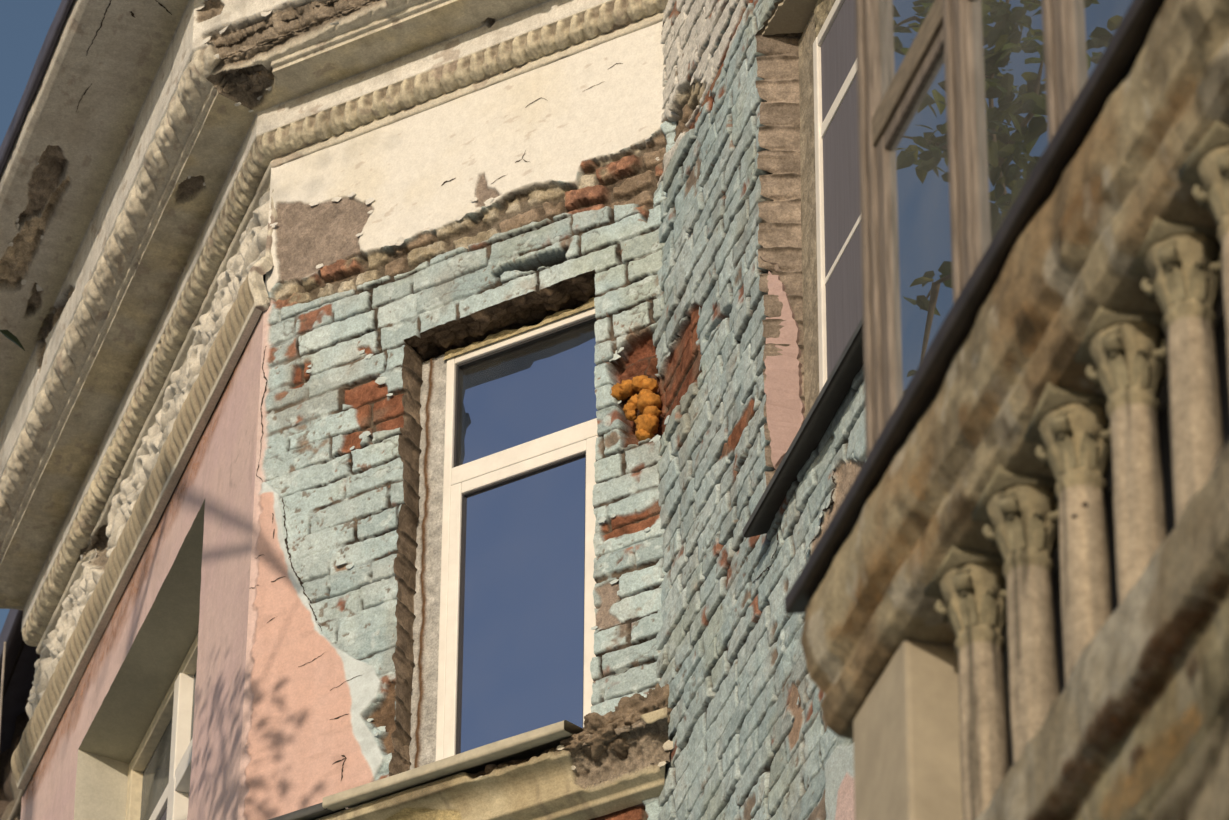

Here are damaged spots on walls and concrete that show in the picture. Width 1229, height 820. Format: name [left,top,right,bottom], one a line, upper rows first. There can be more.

crack [86,0,111,55]
spalling [195,0,386,112]
spalling [270,0,753,309]
flaking render [0,145,75,374]
flaking render [291,362,312,389]
flaking render [340,375,407,455]
flaking render [608,298,703,448]
flaking render [716,256,805,470]
flaking render [598,500,661,542]
flaking render [591,579,621,630]
flaking render [362,681,397,755]
spalling [466,683,674,790]